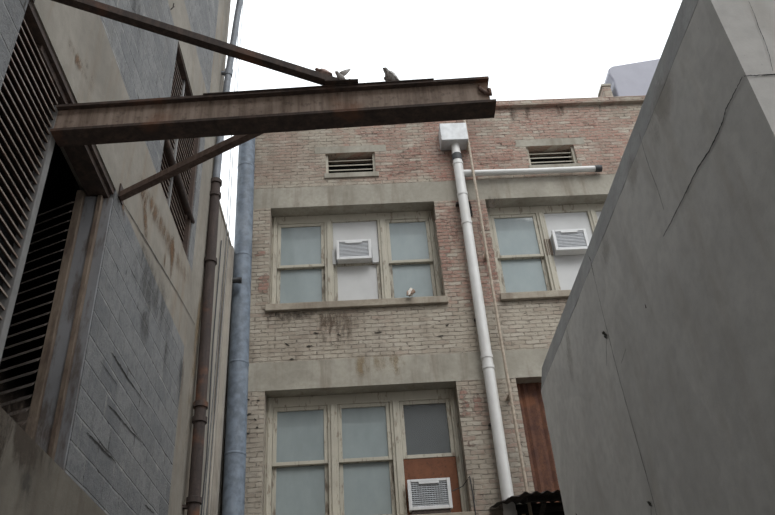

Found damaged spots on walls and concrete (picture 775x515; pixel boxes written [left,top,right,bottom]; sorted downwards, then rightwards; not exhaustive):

crack [641,5,775,236]